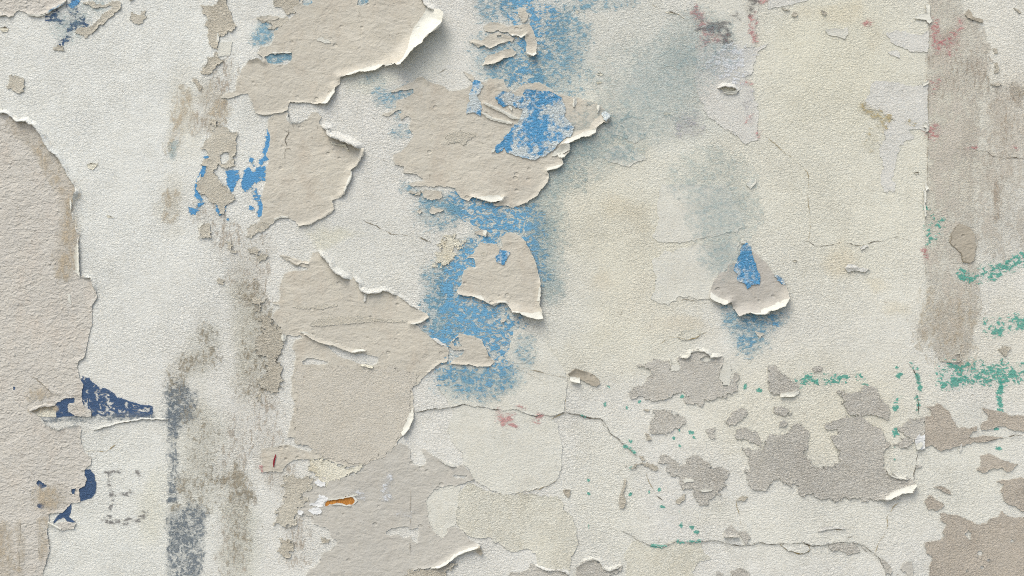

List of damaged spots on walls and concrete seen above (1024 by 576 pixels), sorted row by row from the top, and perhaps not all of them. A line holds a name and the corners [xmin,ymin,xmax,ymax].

peeling [192,0,236,91]
peeling [196,124,238,238]
peeling [382,71,610,214]
peeling [0,107,99,576]
peeling [221,0,495,576]
peeling [432,230,543,322]
crack [416,363,662,500]
peeling [619,454,730,509]
peeling [629,346,739,440]
peeling [710,240,790,316]
peeling [705,365,1024,576]